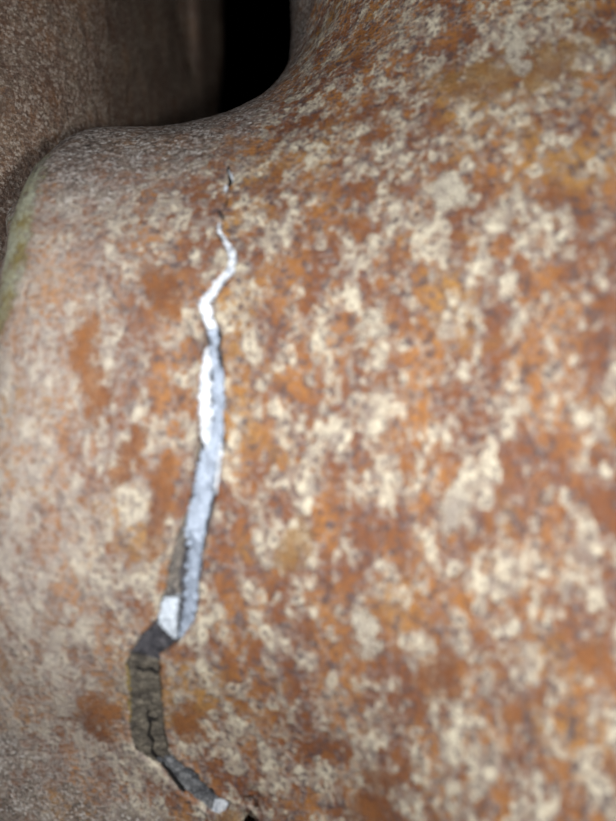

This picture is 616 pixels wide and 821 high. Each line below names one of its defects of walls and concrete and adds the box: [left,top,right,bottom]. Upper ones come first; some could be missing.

rust [142,269,181,317]
rust [66,312,110,423]
rust [109,427,148,486]
rust [145,449,176,562]
crack [125,166,237,813]
rust [412,655,464,699]
rust [75,692,121,739]
rust [173,702,205,744]
rust [345,768,398,821]